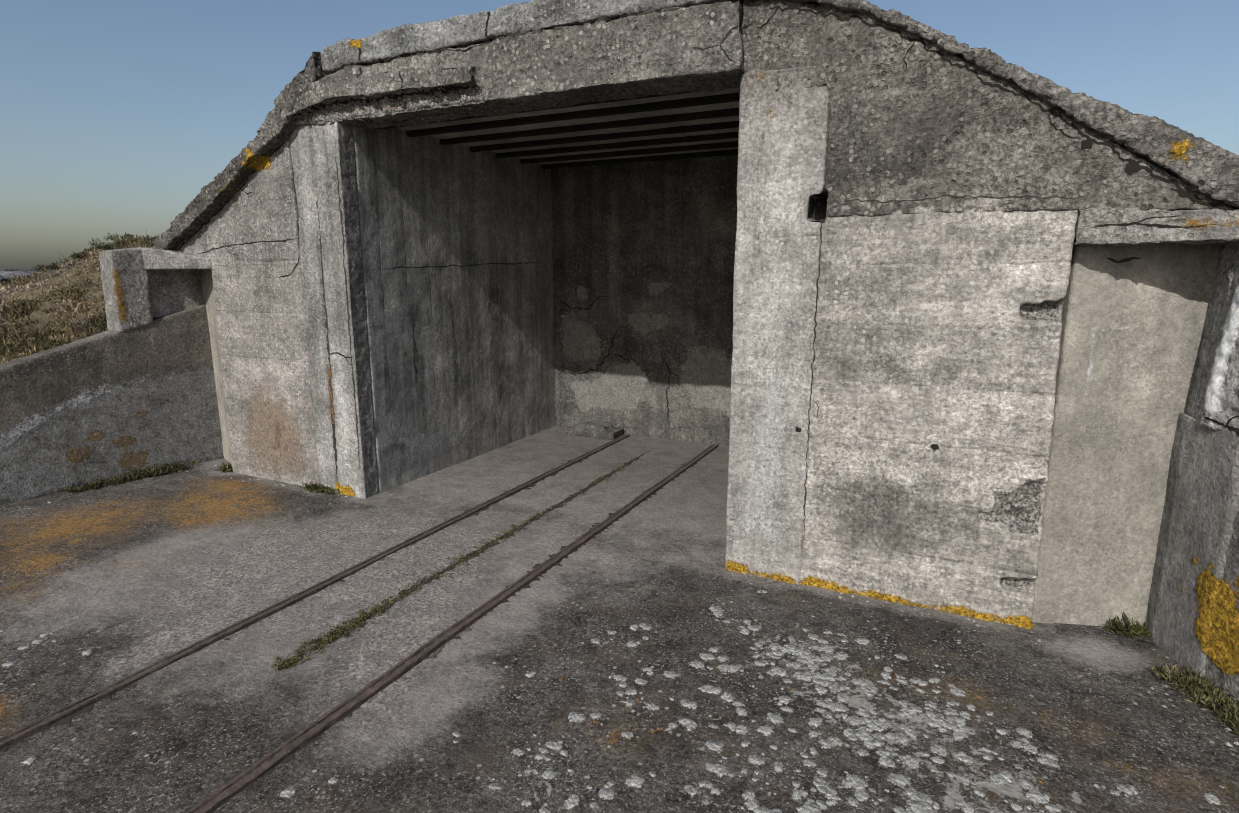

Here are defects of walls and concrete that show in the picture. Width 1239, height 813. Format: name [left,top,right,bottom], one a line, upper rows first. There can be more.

crack [691,4,1239,228]
crack [176,0,716,481]
crack [801,223,822,558]
spalling [975,478,1045,535]
crack [1204,416,1239,436]